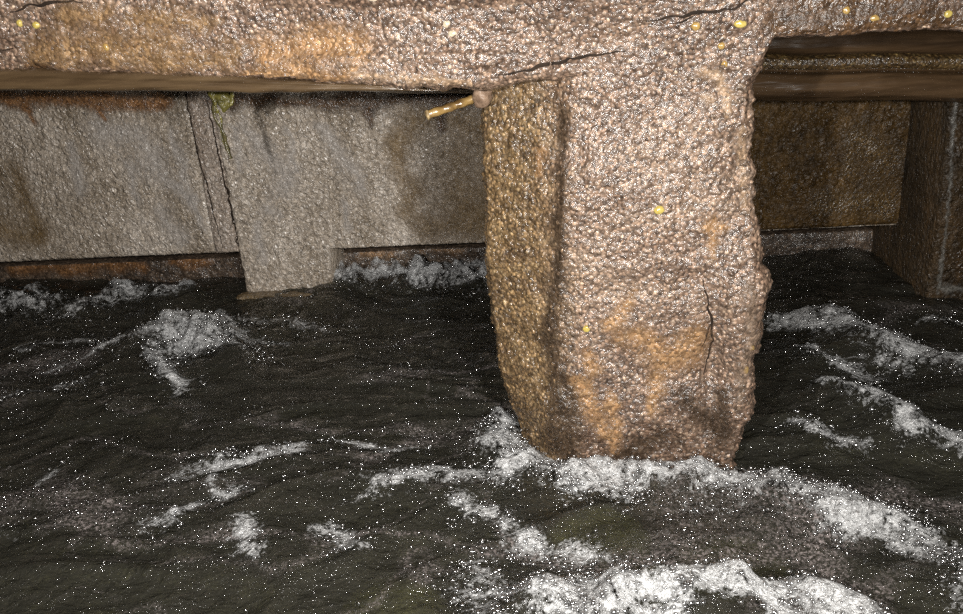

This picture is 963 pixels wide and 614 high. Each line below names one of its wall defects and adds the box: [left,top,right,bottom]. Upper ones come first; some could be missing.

crack [496,51,625,76]
crack [184,91,239,247]